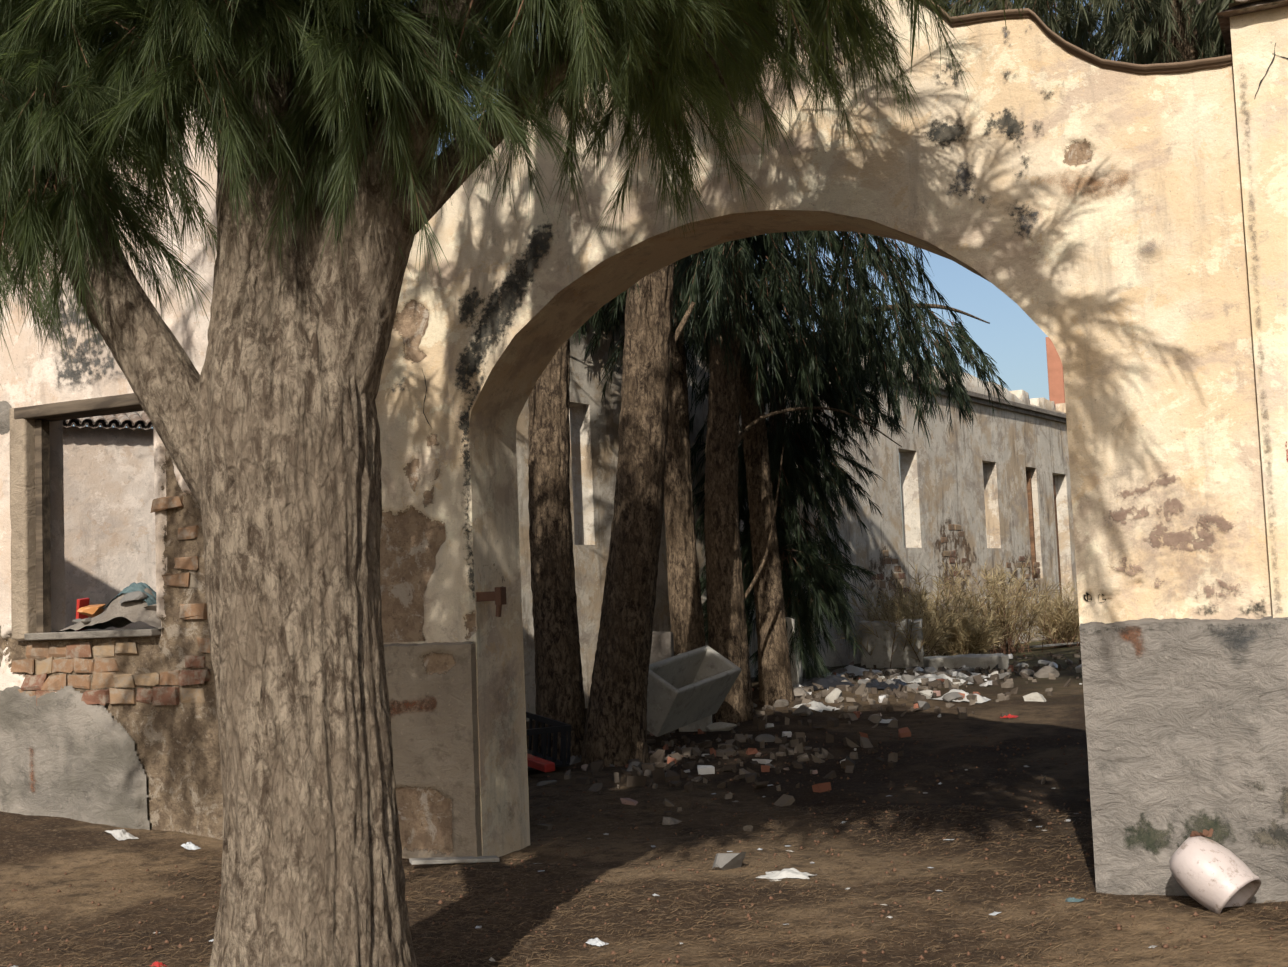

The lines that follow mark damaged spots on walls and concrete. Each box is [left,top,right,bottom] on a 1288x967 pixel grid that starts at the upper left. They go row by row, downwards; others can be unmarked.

crack [1255,43,1288,97]
leakage [924,119,967,149]
leakage [984,108,1043,176]
leakage [949,162,989,204]
leakage [1010,205,1039,238]
flaking render [393,299,429,363]
leakage [455,224,553,600]
flaking render [380,505,447,643]
flaking render [0,448,223,840]
leakage [1124,811,1236,855]
leakage [1252,788,1288,850]